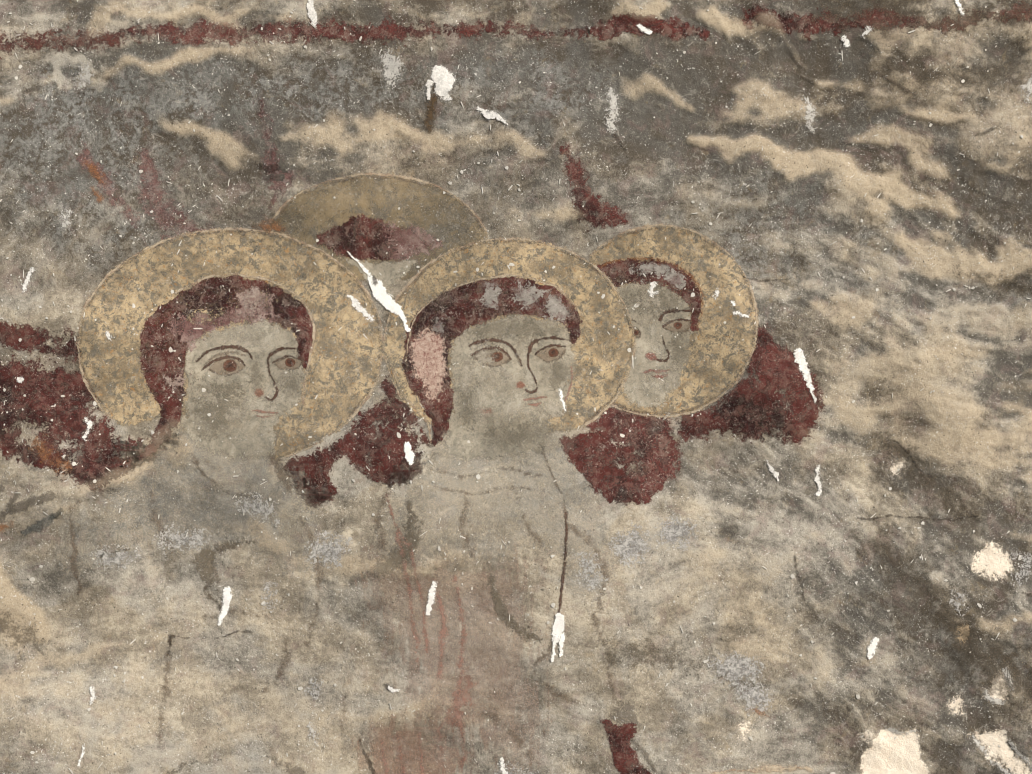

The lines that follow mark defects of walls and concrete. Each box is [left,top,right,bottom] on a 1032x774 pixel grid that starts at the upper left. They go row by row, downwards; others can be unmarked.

spalling [971,542,1014,581]
spalling [858,728,930,774]
spalling [967,729,1032,774]